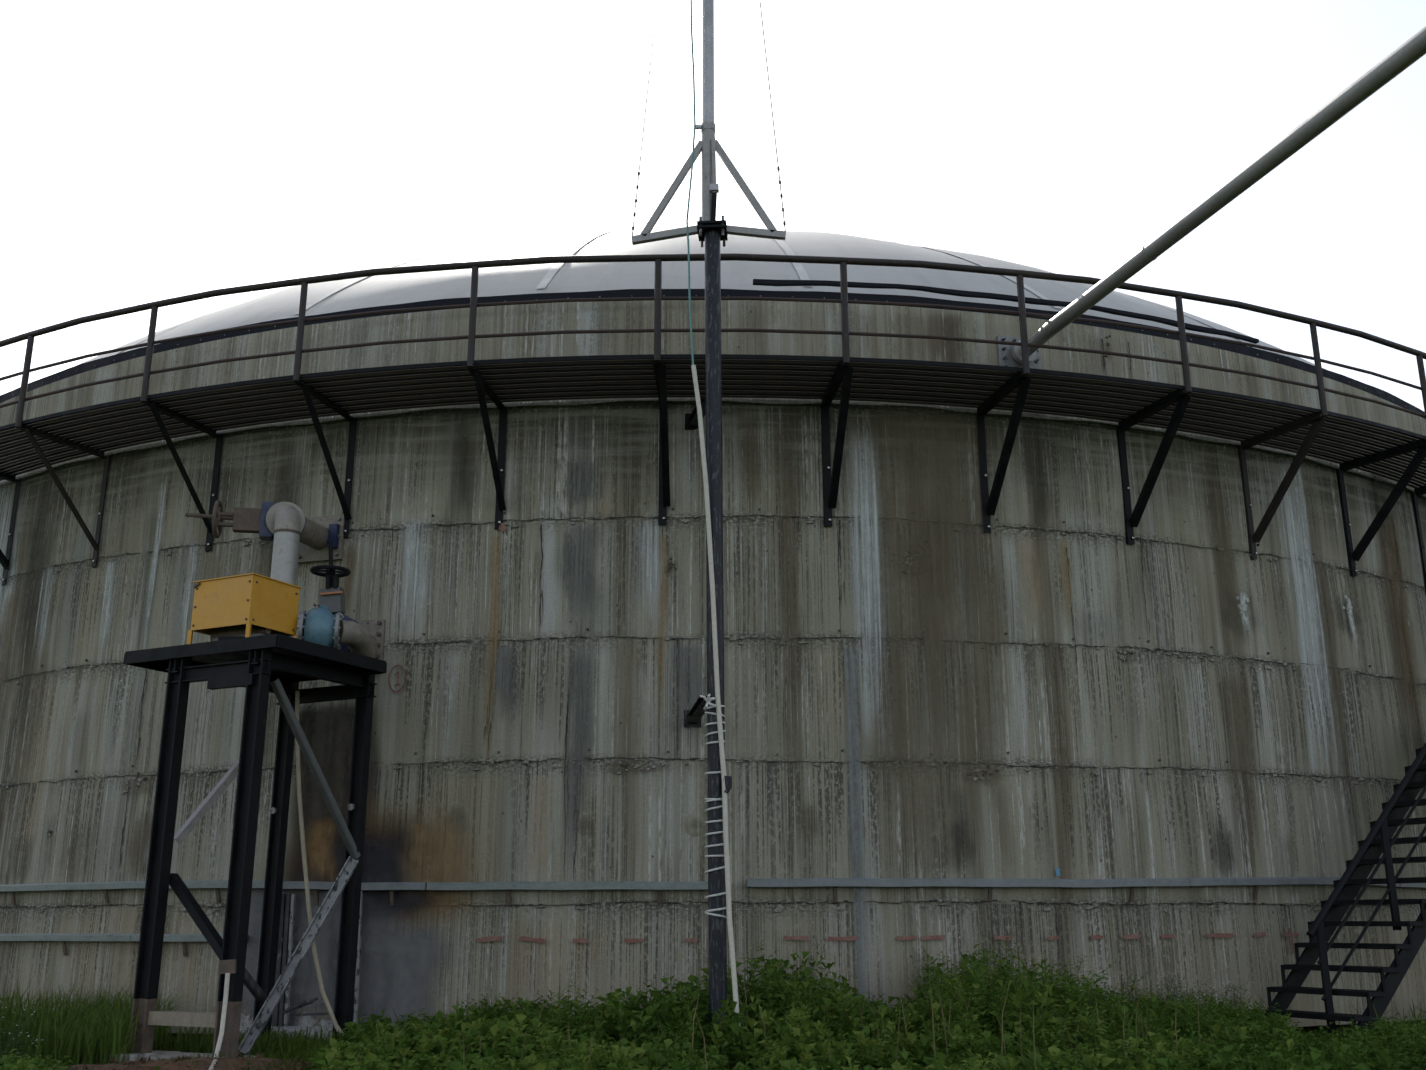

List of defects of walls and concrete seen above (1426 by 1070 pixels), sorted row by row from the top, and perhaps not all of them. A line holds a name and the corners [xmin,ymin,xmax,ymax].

water stain [149,494,163,594]
water stain [1235,595,1249,623]
water stain [1283,471,1330,694]
water stain [1342,595,1356,638]